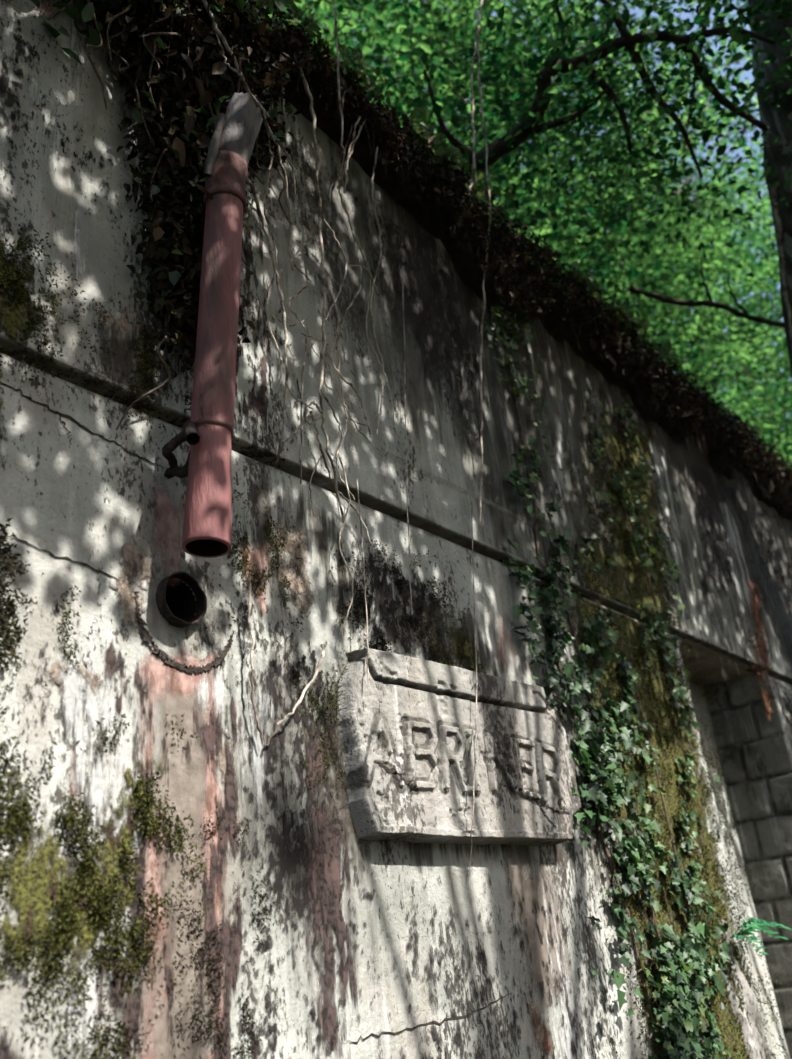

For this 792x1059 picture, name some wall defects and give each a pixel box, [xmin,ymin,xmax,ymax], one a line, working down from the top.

crack [0,381,168,468]
crack [0,530,234,674]
water stain [338,536,349,602]
corrosion [744,579,772,719]
water stain [300,722,358,1059]
water stain [502,845,589,1059]
crack [343,994,508,1057]